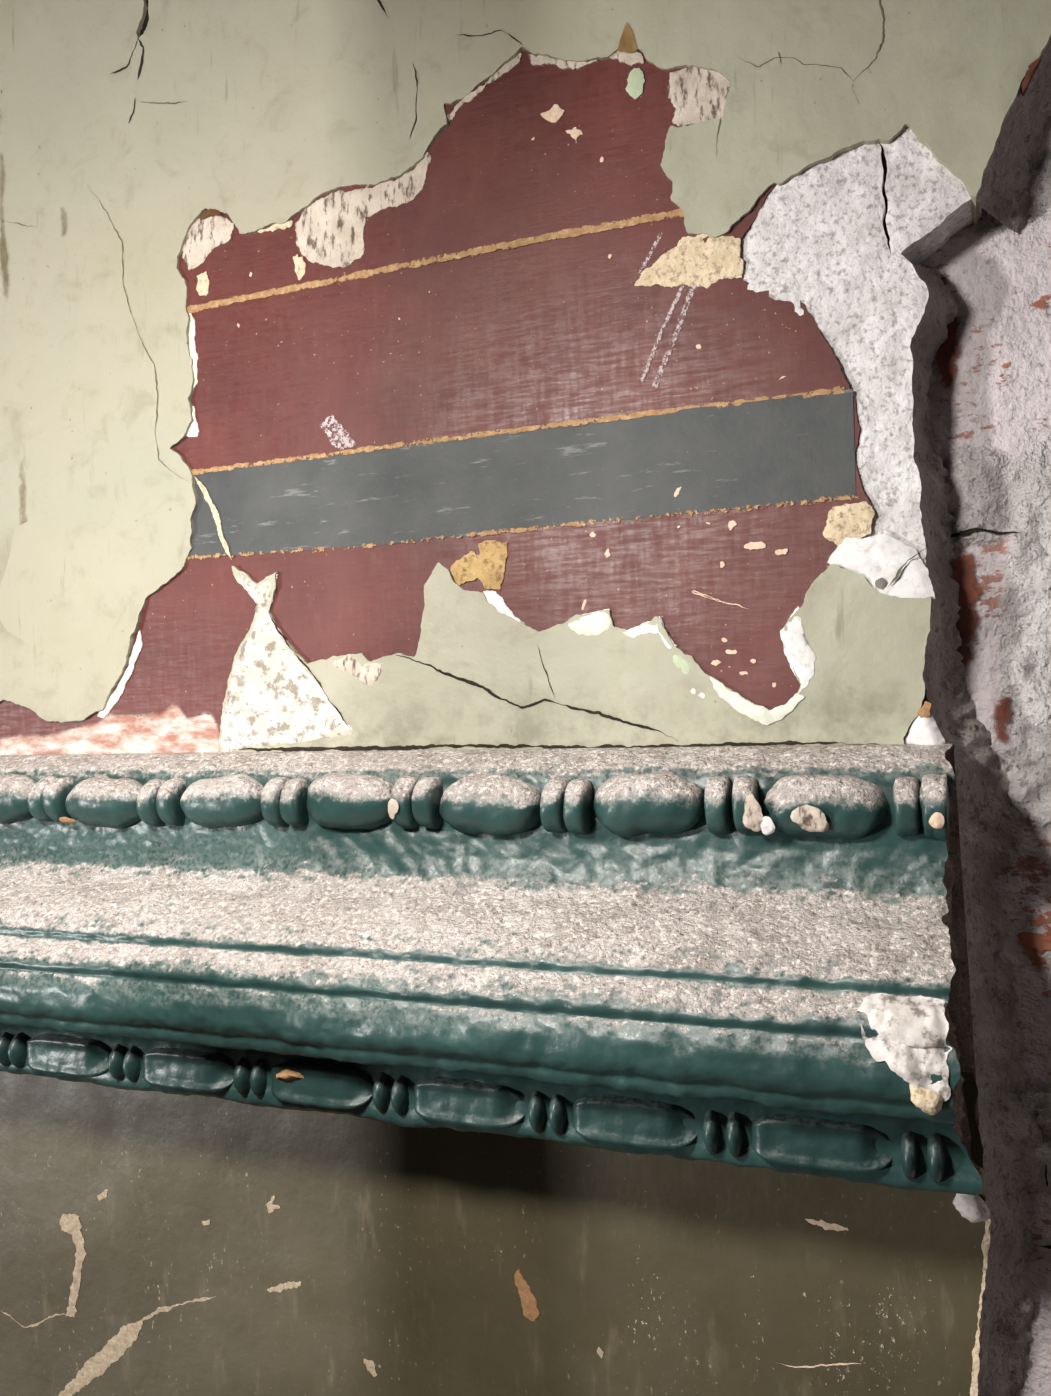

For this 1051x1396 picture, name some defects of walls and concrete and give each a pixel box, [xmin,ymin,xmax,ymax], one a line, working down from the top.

crack [110,0,184,123]
crack [740,0,884,103]
flaking render [976,38,1051,234]
crack [88,187,232,560]
peeling [0,50,875,755]
crack [950,528,1019,537]
spalling [388,799,399,819]
flaking render [740,127,1045,1396]
spalling [276,1069,304,1081]
spalling [0,1213,87,1328]
spalling [59,1296,215,1396]
spalling [514,1269,539,1321]